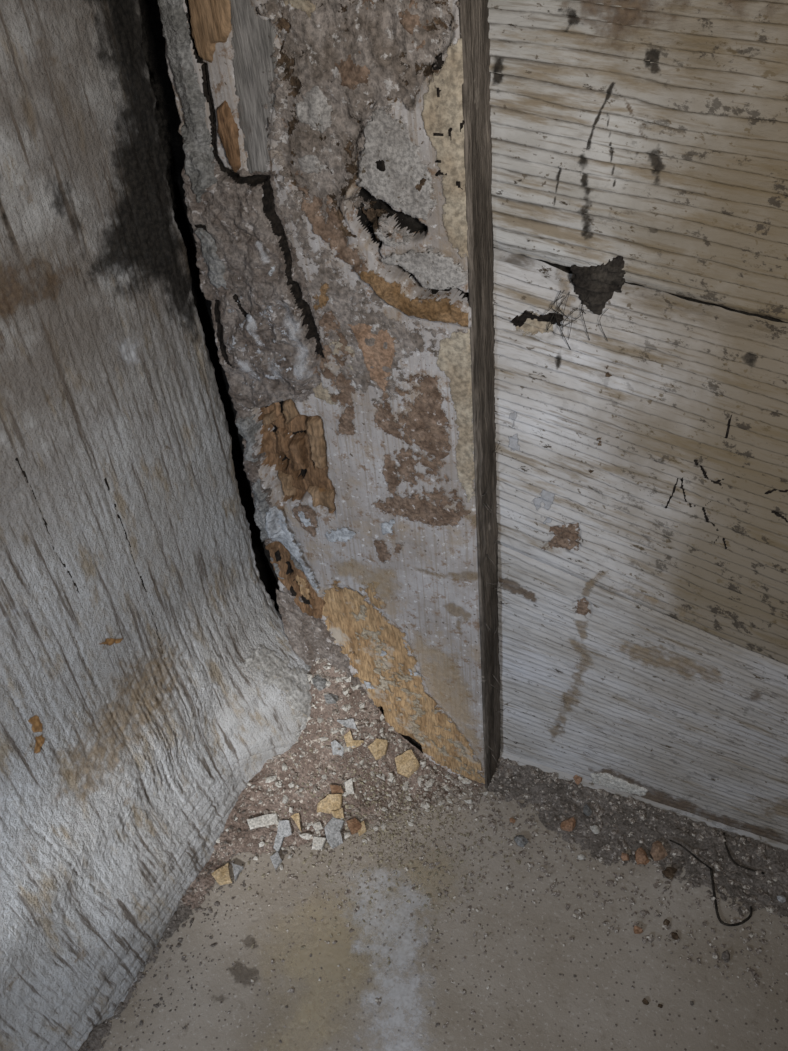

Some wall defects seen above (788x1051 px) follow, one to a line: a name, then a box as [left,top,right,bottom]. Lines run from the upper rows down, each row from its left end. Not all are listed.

peeling [230,0,469,291]
crack [139,0,324,613]
peeling [235,401,284,462]
peeling [252,479,356,605]
peeling [307,283,475,562]
peeling [511,310,563,336]
peeling [533,490,581,551]
peeling [216,662,488,870]